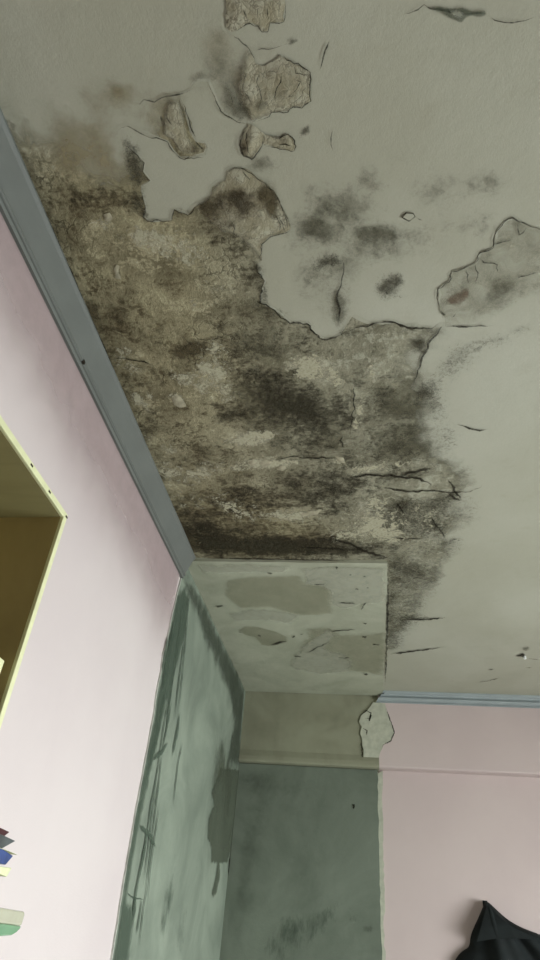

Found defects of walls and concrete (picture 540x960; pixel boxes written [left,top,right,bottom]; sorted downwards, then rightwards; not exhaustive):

peeling [225,0,286,32]
water stain [126,142,148,218]
water stain [377,275,403,294]
peeling [436,217,540,318]
peeling [14,77,466,649]
water stain [189,515,360,556]
water stain [372,493,455,536]
crack [355,468,478,513]
water stain [0,212,244,960]
peeling [359,702,395,758]
peeling [110,569,382,960]